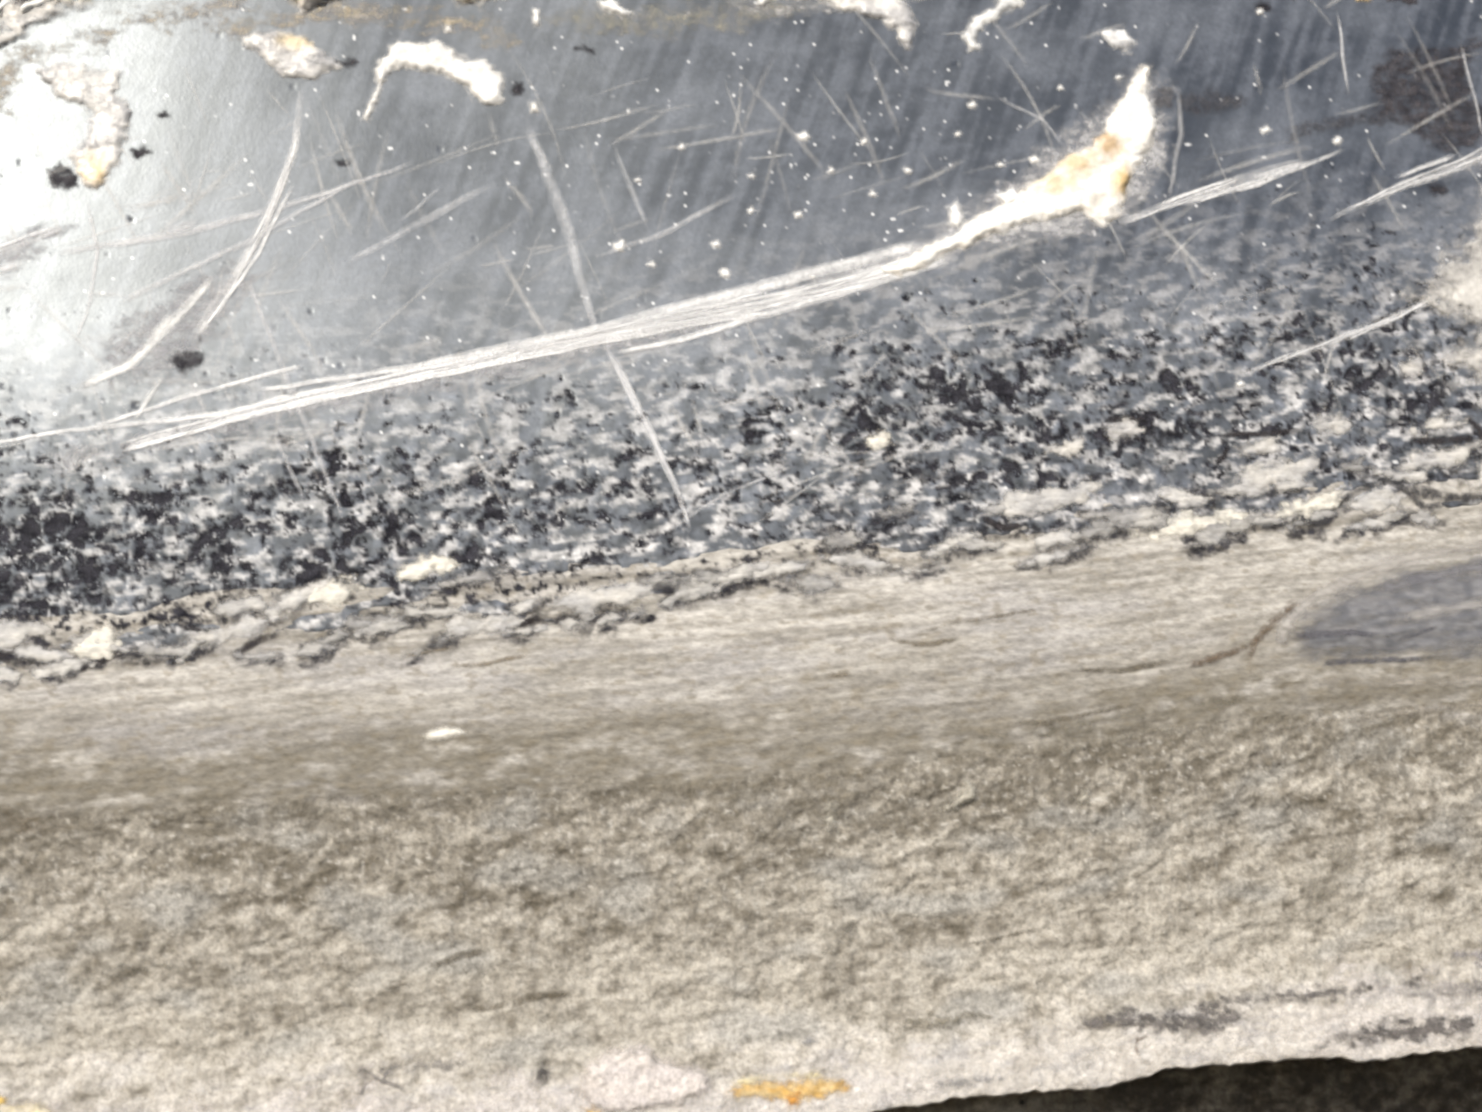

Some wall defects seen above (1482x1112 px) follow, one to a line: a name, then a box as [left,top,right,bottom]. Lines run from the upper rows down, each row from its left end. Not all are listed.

peeling [0,0,82,43]
peeling [243,31,357,79]
peeling [364,27,538,119]
peeling [601,0,630,15]
peeling [962,0,1024,50]
peeling [1101,30,1134,50]
damp [207,139,296,323]
damp [112,245,936,449]
damp [1268,295,1440,365]
damp [0,429,80,443]
damp [1278,543,1482,658]